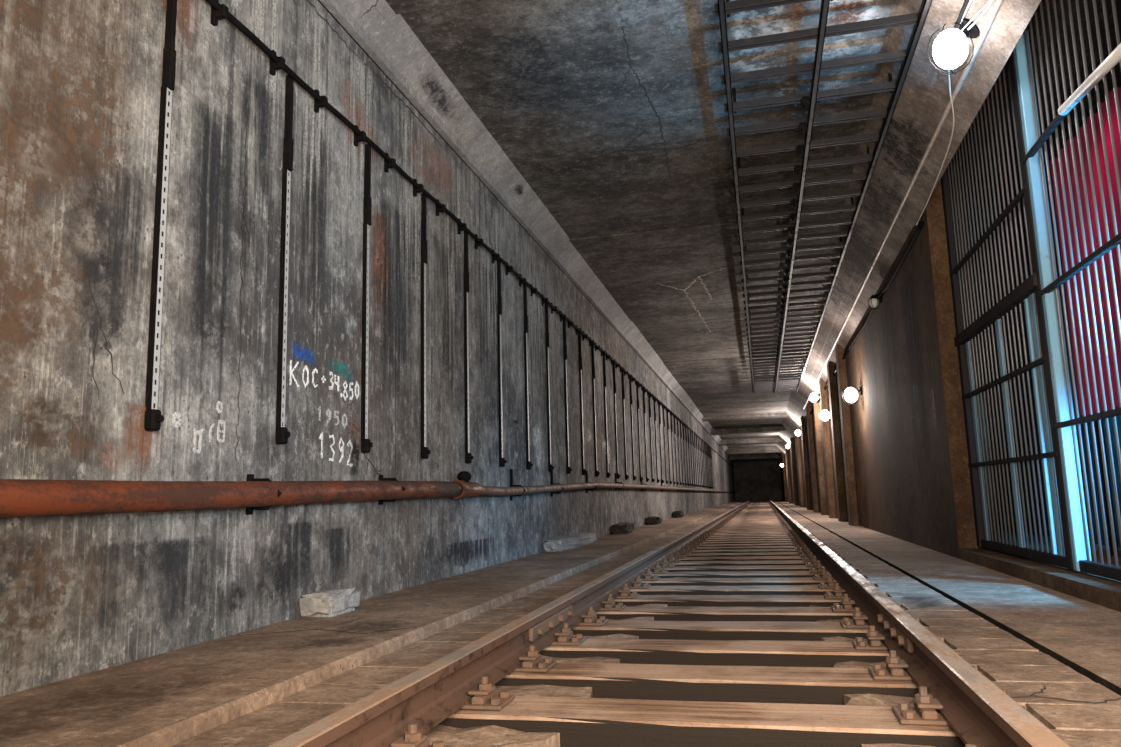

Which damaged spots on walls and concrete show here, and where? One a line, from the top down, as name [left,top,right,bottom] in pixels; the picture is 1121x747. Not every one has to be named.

water stain [251,0,283,58]
rust [831,1,862,25]
water stain [348,57,371,193]
water stain [194,70,279,348]
crack [83,265,124,399]